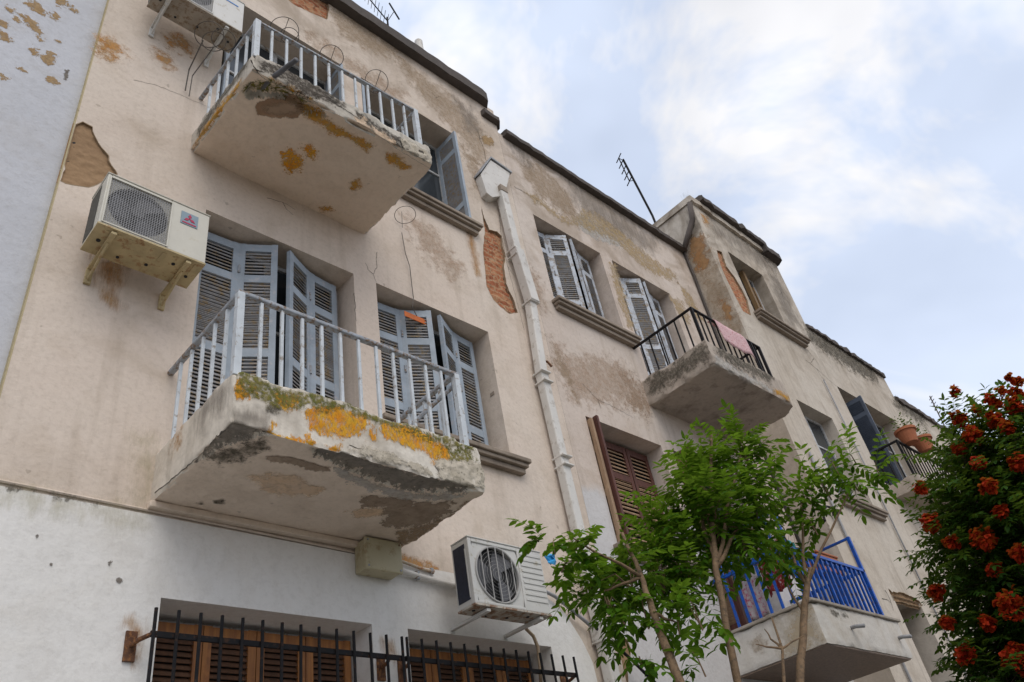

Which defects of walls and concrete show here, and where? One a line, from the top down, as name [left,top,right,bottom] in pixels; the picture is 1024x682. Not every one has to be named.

peeling [0,0,79,86]
spalling [56,121,118,188]
spalling [481,207,518,314]
spalling [690,235,751,320]
damp [555,344,774,408]
damp [205,413,270,464]